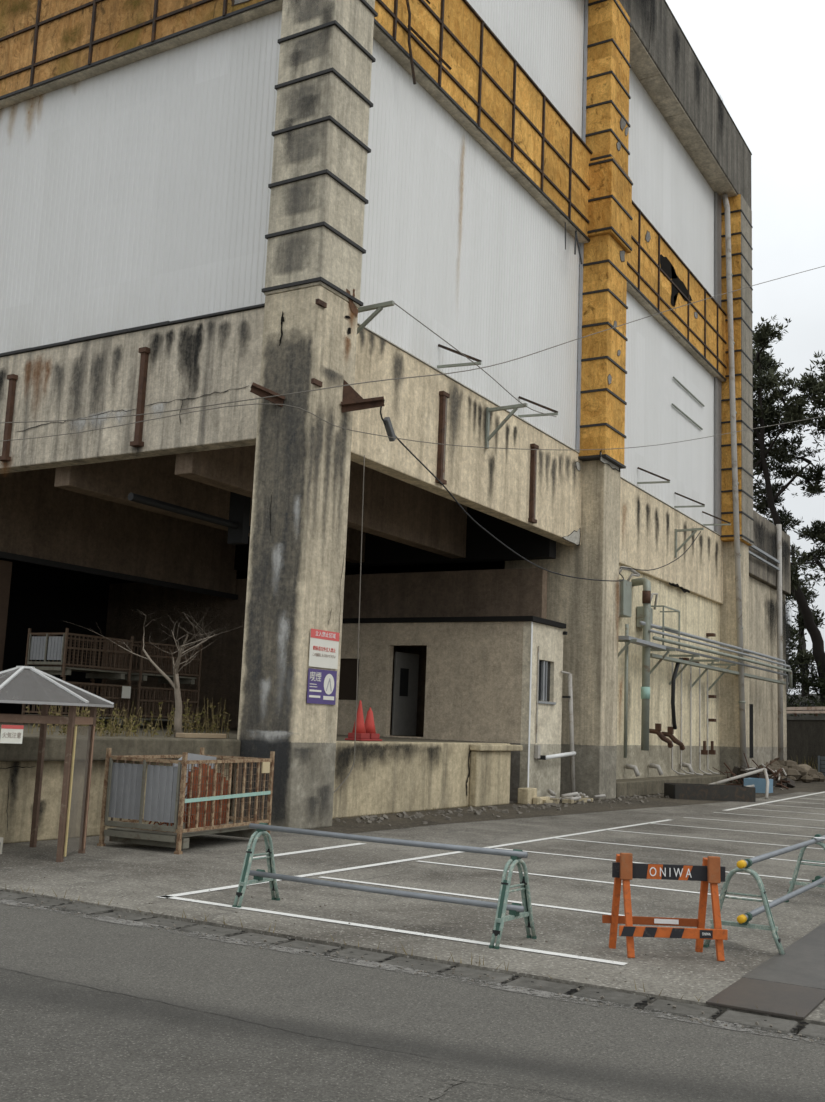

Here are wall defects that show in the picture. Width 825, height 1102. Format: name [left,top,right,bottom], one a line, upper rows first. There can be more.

spalling [660,254,698,318]
water stain [56,347,126,425]
water stain [152,322,228,387]
water stain [394,355,403,387]
water stain [451,387,517,450]
water stain [539,451,576,485]
water stain [638,499,669,536]
water stain [684,526,718,564]
water stain [237,338,347,820]
water stain [337,744,413,776]